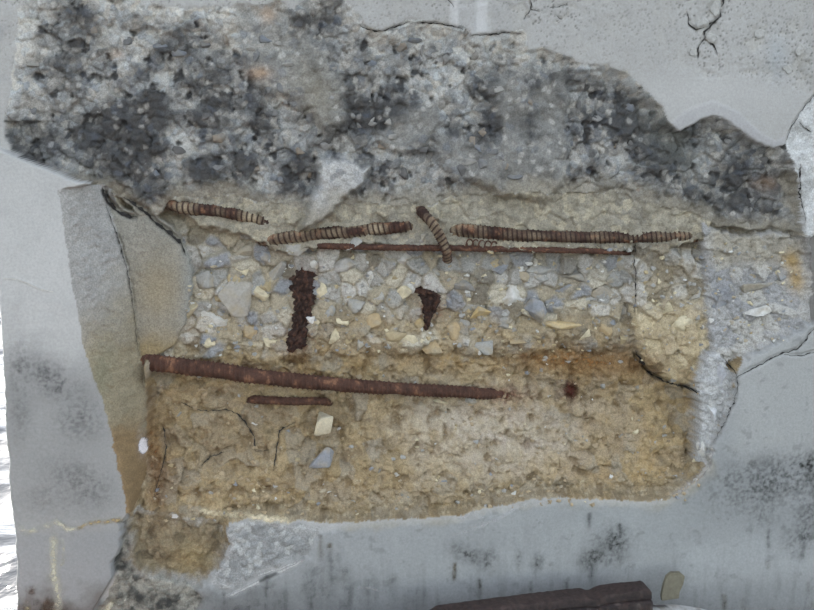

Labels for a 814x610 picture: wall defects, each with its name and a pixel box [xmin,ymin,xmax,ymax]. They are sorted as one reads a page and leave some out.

crack [361,0,563,36]
crack [687,0,724,57]
spalling [4,0,814,237]
spalling [57,184,195,513]
crack [102,188,185,354]
crack [183,403,296,471]
rust [286,268,318,353]
rust [414,286,441,331]
spalling [98,188,814,610]
crack [636,352,700,393]
crack [714,329,814,440]
leakage [752,456,814,502]